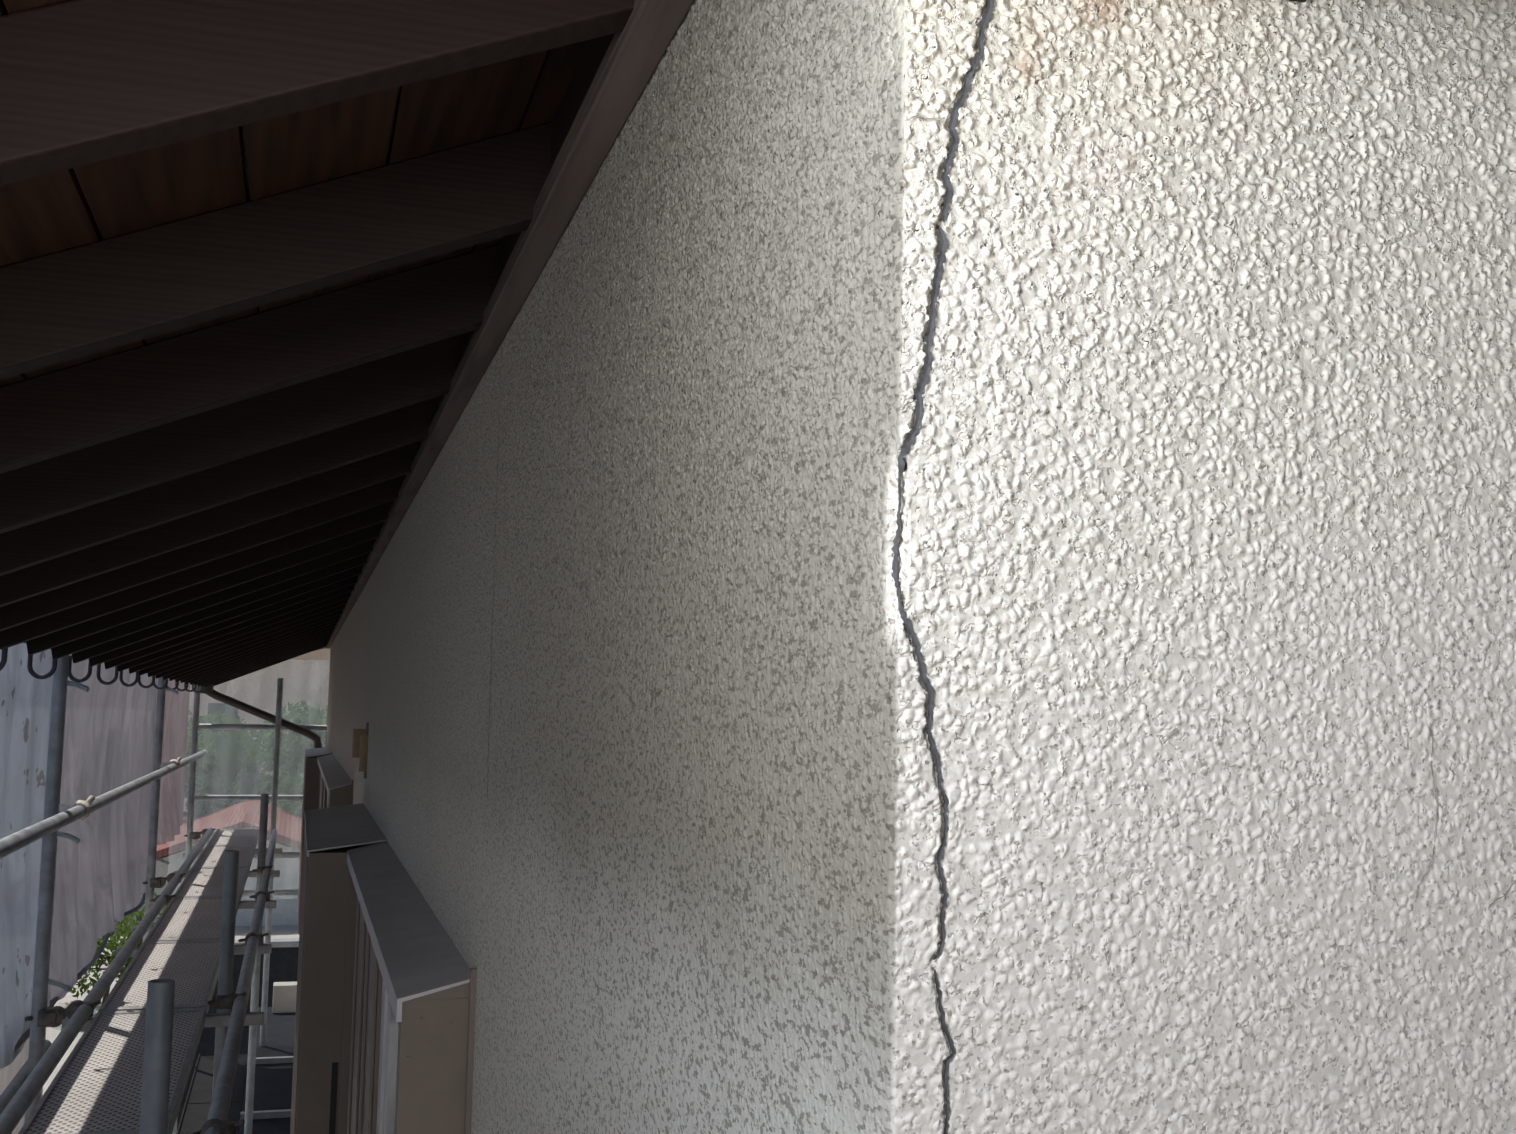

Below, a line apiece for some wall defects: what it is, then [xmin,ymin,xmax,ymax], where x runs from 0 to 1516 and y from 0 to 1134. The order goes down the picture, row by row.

crack [891,0,994,1134]